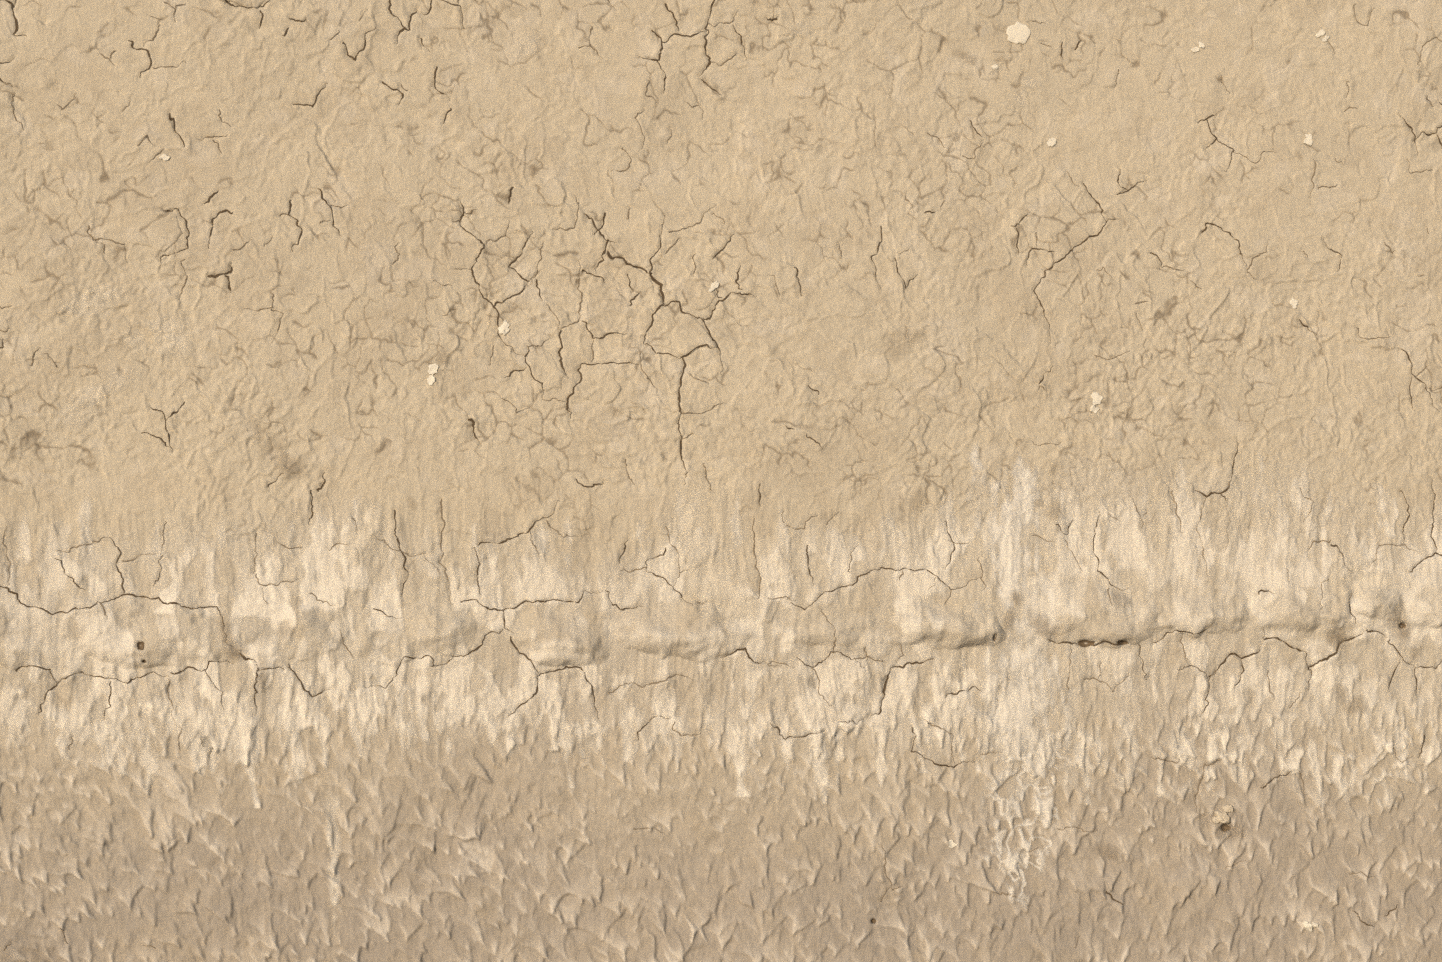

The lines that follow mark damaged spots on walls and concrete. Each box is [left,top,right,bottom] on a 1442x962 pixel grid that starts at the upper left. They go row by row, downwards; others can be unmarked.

crack [0,0,23,129]
crack [225,0,478,123]
crack [611,0,777,172]
crack [86,188,345,331]
crack [433,187,803,491]
crack [1014,171,1147,334]
crack [0,521,330,752]
crack [254,459,708,740]
water stain [0,448,1442,905]
crack [720,484,1003,740]
crack [1034,447,1238,606]
crack [1048,484,1442,717]